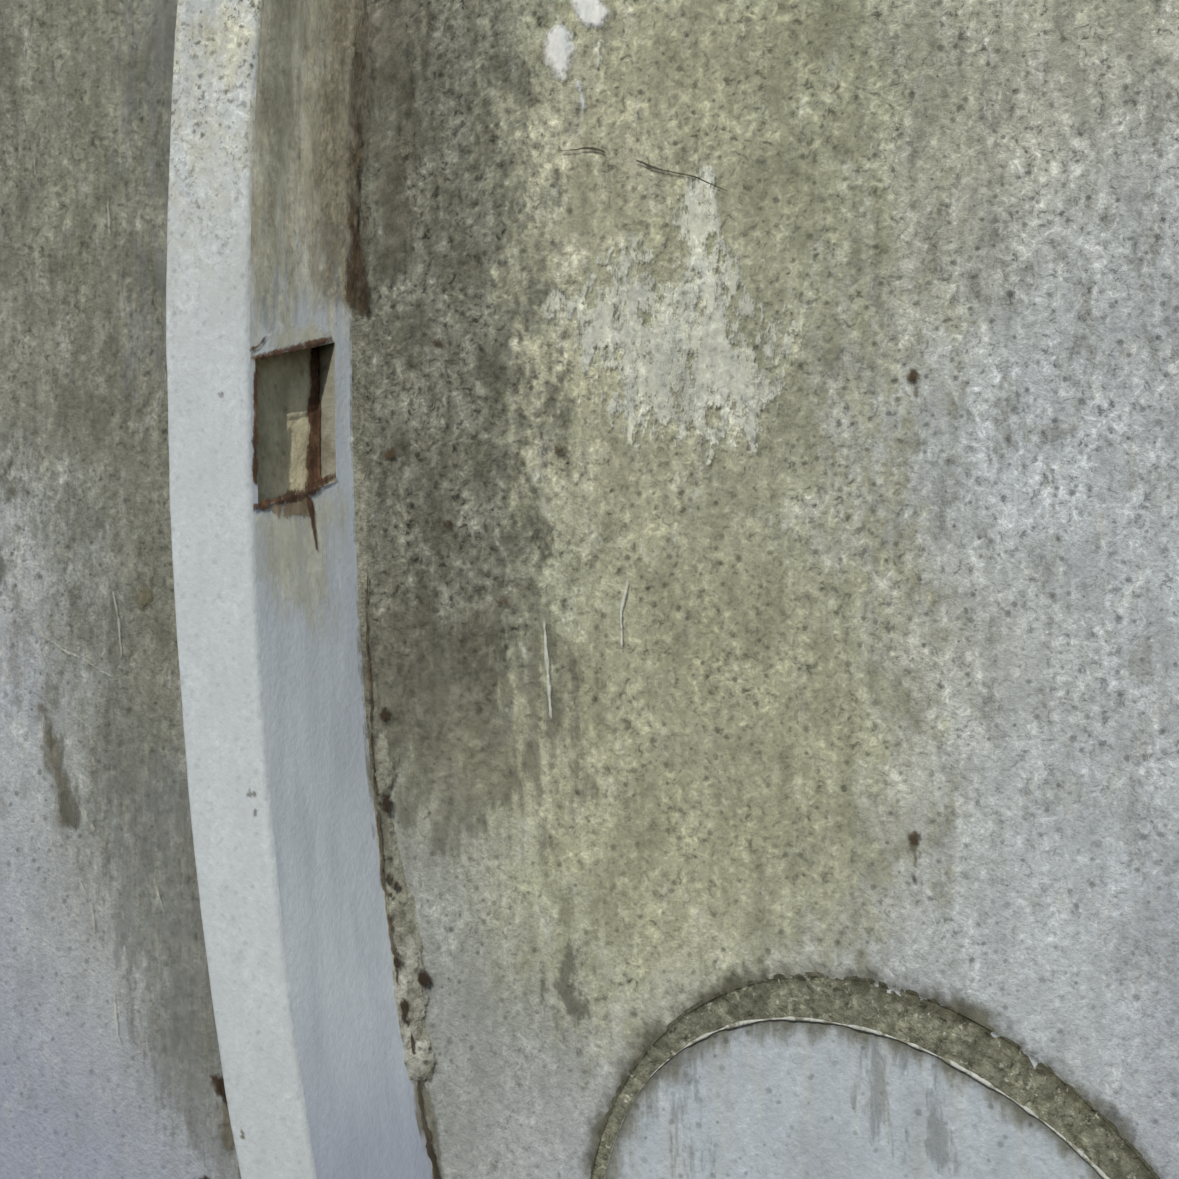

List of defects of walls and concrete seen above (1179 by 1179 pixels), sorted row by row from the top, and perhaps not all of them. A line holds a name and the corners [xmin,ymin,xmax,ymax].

corrosion [345,0,372,314]
spalling [349,0,803,742]
corrosion [250,335,336,550]
spalling [378,795,393,813]
spalling [400,999,410,1022]
spalling [418,970,431,986]
corrosion [211,1074,234,1150]